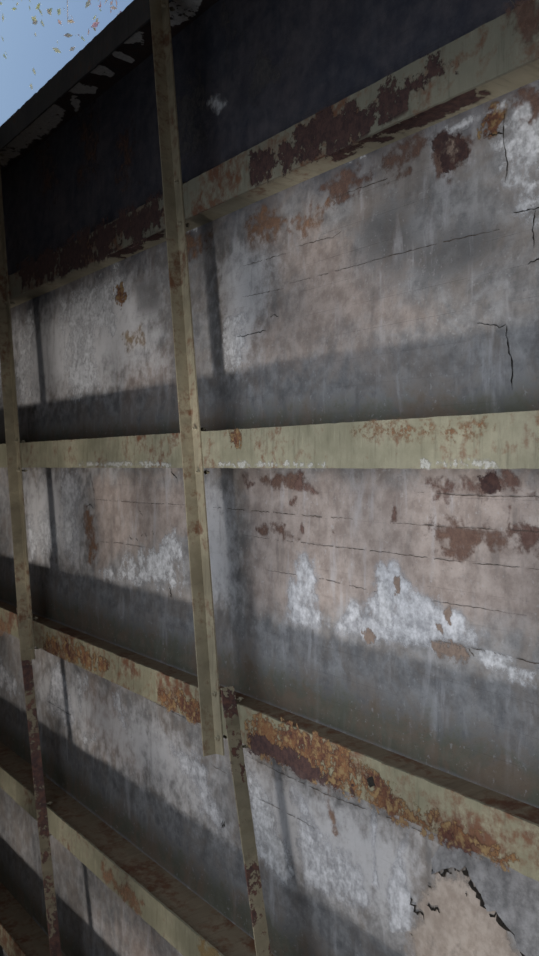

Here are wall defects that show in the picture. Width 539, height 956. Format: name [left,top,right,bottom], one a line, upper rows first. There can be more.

peeling [112,31,144,63]
peeling [169,0,202,26]
peeling [0,65,115,167]
corrosion [248,51,539,241]
corrosion [16,192,166,290]
crack [249,207,539,296]
corrosion [420,458,520,500]
corrosion [428,519,539,561]
leakage [287,553,321,629]
leakage [335,561,534,686]
corrosion [244,713,519,872]
spalling [405,841,539,956]